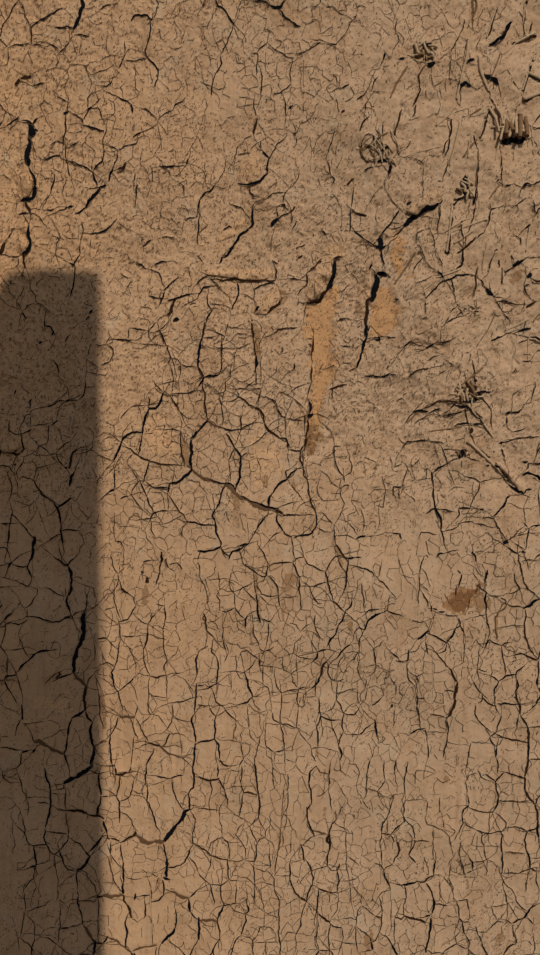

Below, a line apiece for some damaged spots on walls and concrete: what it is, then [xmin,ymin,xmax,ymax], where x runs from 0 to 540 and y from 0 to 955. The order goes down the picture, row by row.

crack [0,226,54,335]
crack [314,0,540,399]
crack [0,256,540,955]